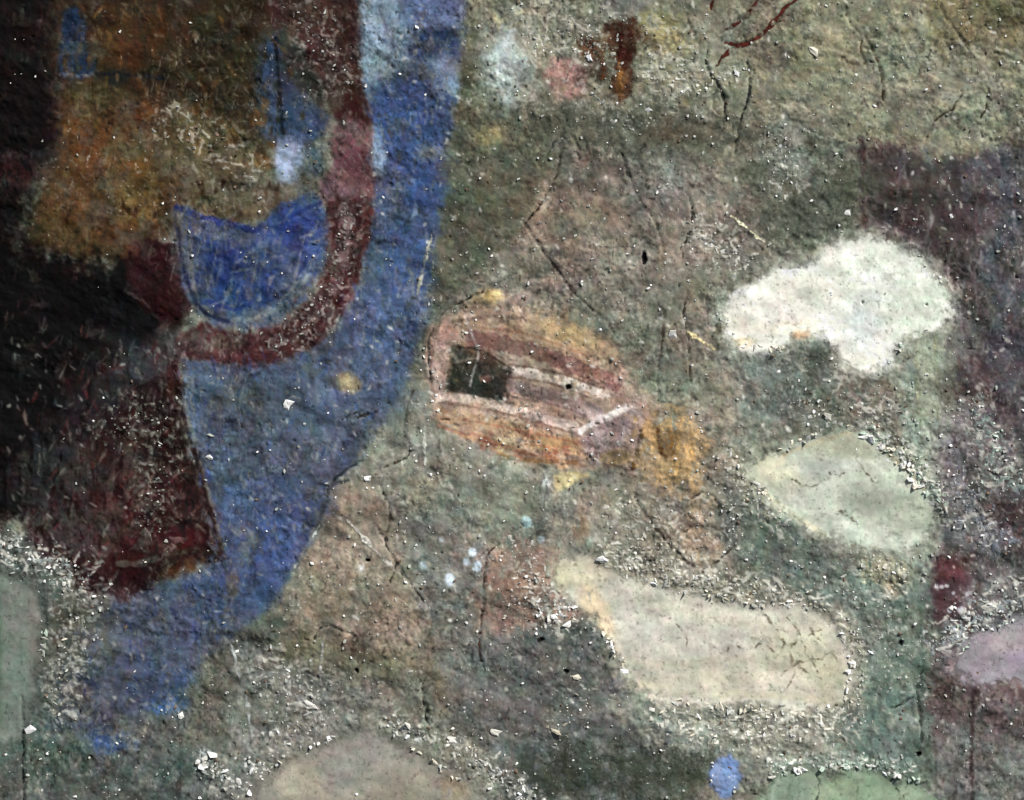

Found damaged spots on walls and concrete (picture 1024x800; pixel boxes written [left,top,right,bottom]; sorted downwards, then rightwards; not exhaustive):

crack [688,0,797,142]
crack [524,140,610,326]
spalling [715,385,1024,593]
spalling [0,530,90,751]
spalling [493,488,945,800]